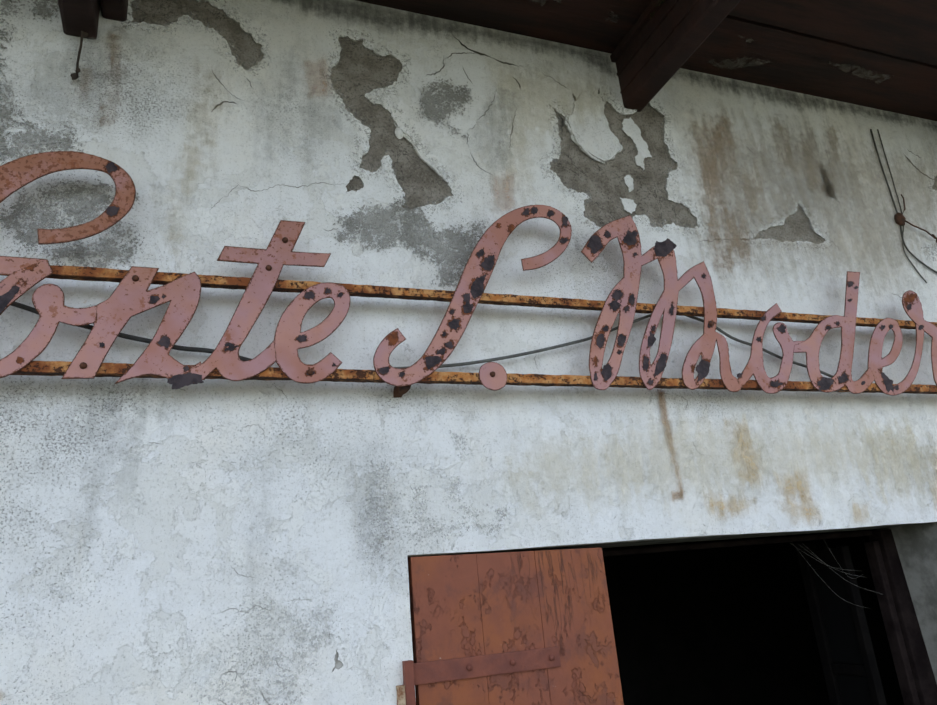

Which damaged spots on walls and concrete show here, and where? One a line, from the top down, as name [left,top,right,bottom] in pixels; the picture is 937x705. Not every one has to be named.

spalling [131,0,268,70]
spalling [325,35,488,291]
crack [427,37,521,175]
crack [545,75,576,135]
spalling [545,90,697,228]
spalling [740,204,824,246]